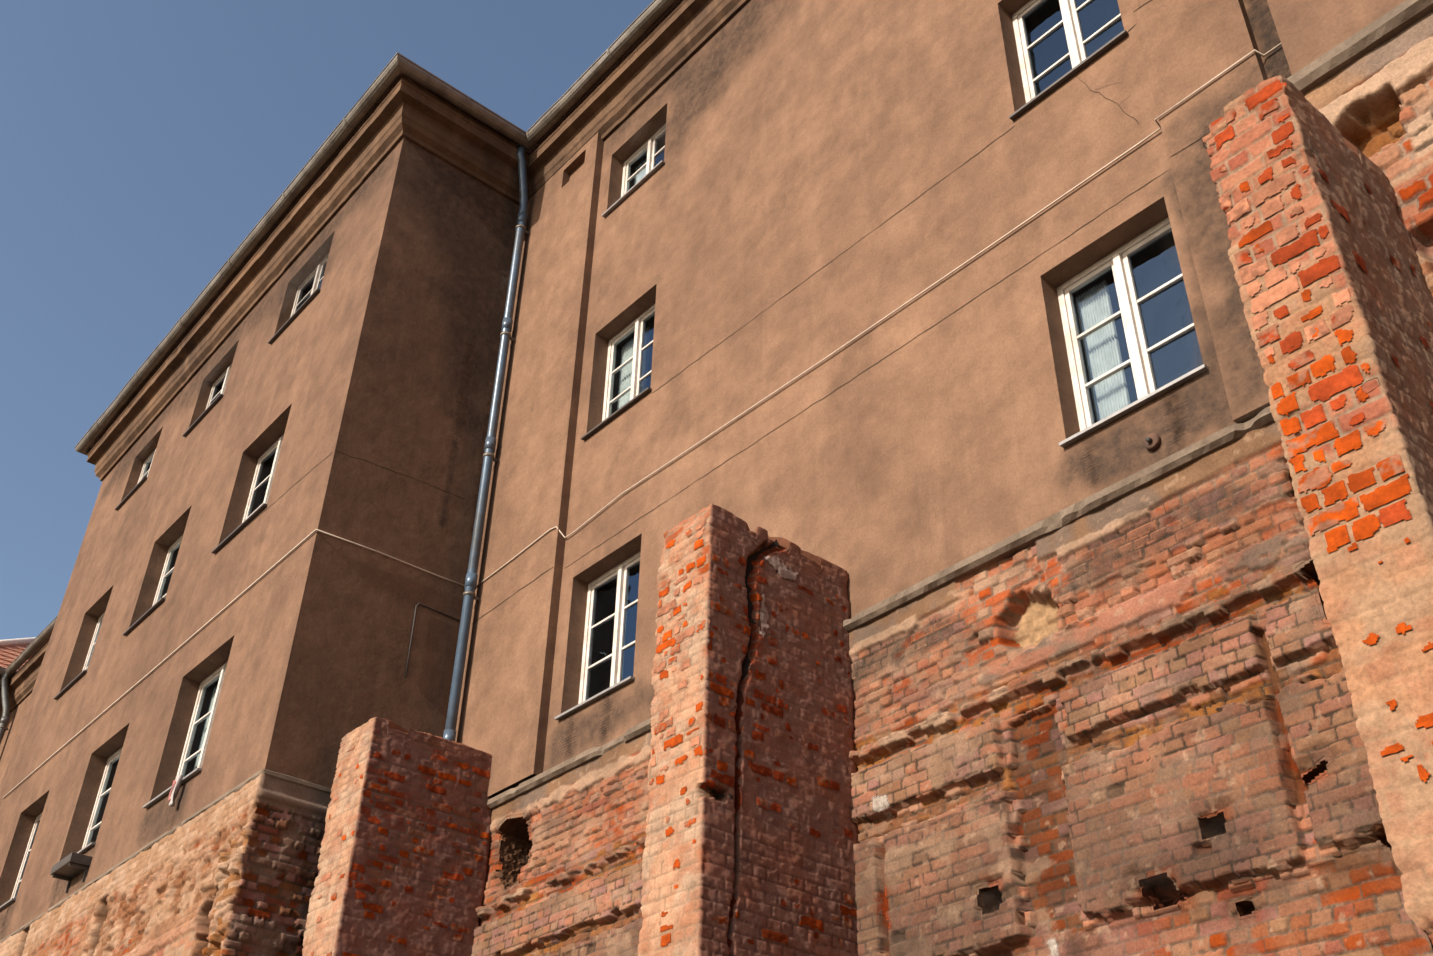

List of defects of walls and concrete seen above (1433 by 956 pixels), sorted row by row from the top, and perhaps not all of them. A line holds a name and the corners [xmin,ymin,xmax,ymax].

crack [1075,75,1138,123]
spalling [1362,632,1379,645]
spalling [1395,622,1412,634]
crack [711,540,779,954]
spalling [1302,755,1334,786]
spalling [1380,743,1430,782]
spalling [1415,713,1433,744]
spalling [317,745,533,942]
spalling [1363,820,1393,858]